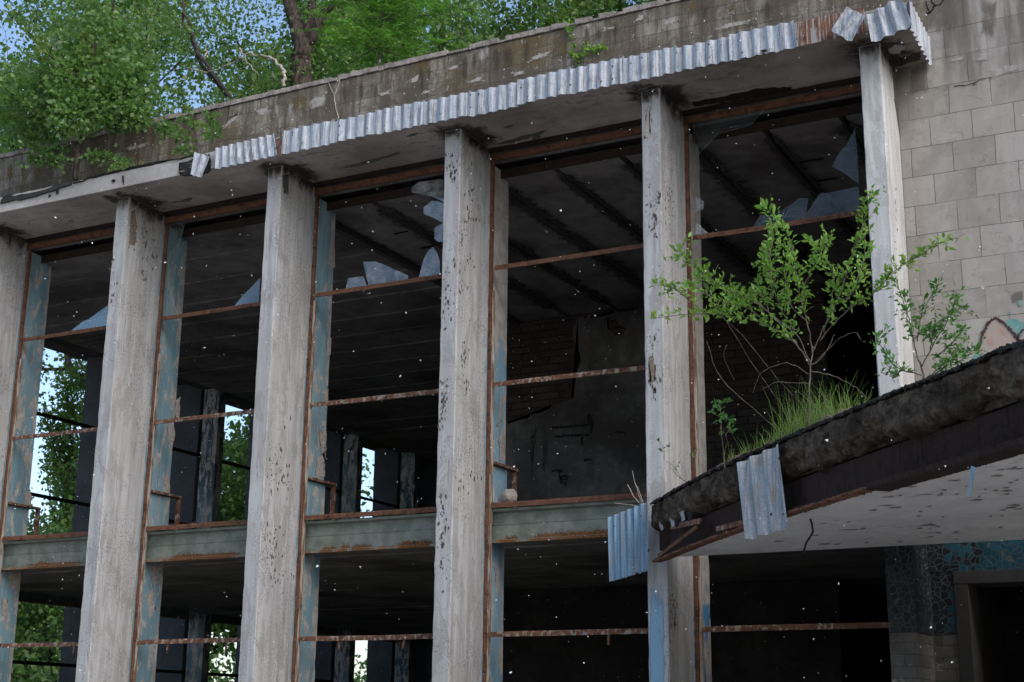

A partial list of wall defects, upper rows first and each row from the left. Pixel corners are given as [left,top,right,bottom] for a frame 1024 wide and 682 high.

leakage [626,84,691,120]
peeling [167,397,181,451]
peeling [496,308,1024,540]
peeling [315,426,327,480]
corrosion [164,552,238,561]
peeling [262,512,315,601]
corrosion [399,540,432,548]
corrosion [533,529,608,540]